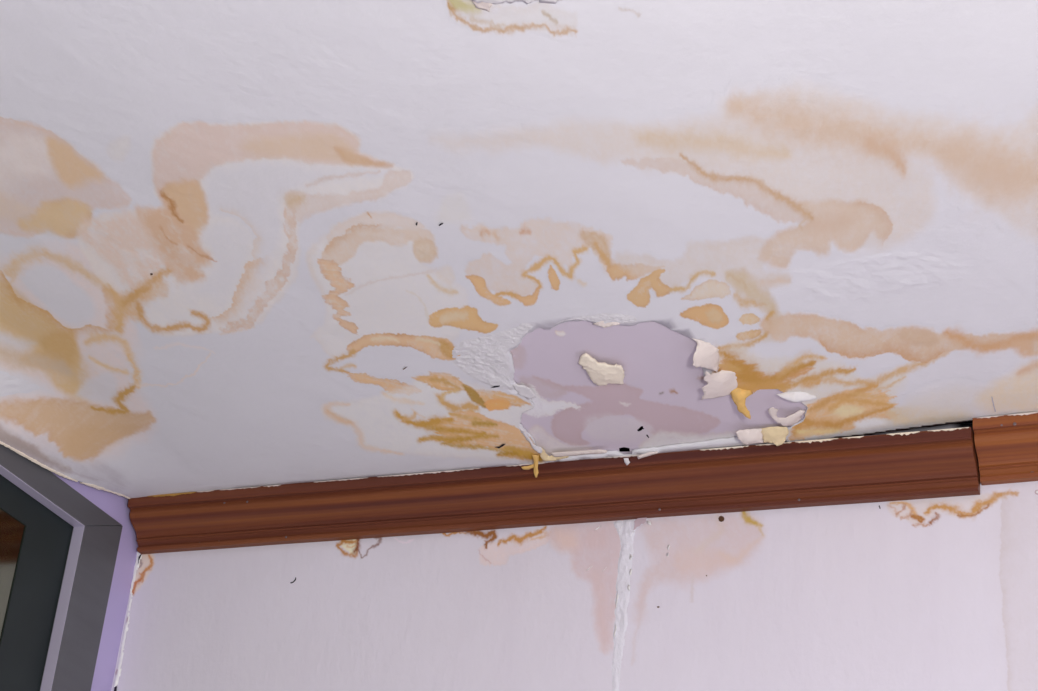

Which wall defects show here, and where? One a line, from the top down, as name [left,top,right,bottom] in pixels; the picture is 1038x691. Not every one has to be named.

leakage [443,0,581,39]
peeling [472,0,561,12]
leakage [0,72,1038,494]
peeling [510,320,817,478]
leakage [440,510,774,667]
leakage [883,481,1038,691]